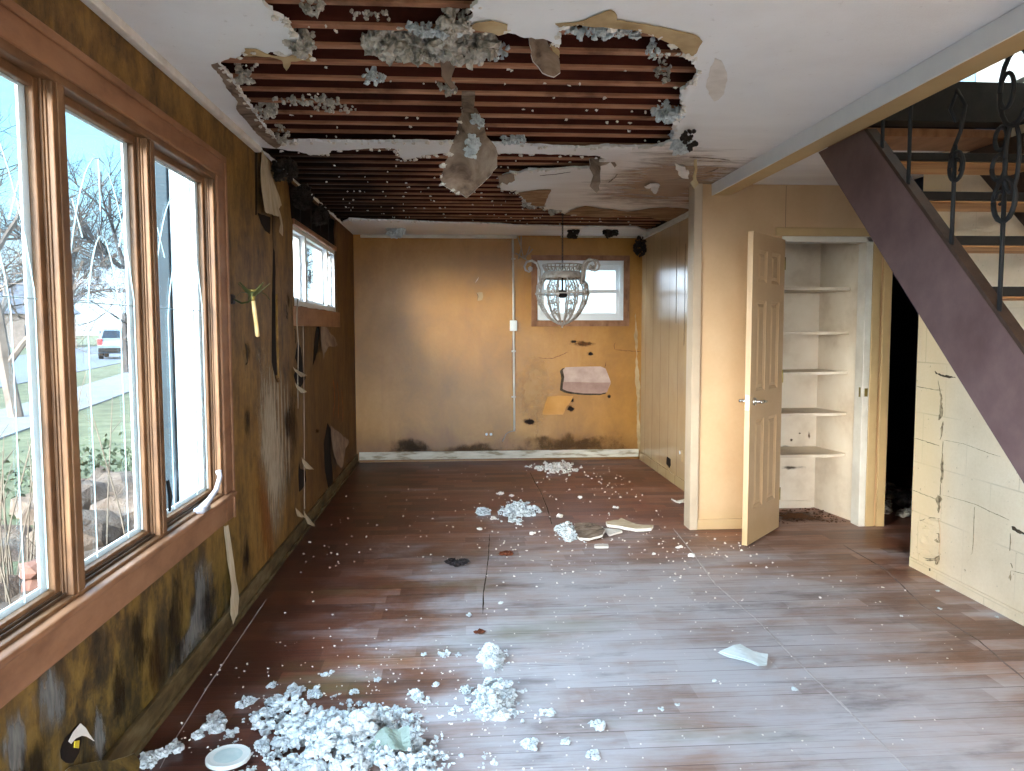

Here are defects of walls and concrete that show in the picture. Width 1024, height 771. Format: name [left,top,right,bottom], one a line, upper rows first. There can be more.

peeling [638,29,727,102]
spalling [218,66,462,195]
peeling [258,151,283,236]
peeling [675,163,689,179]
peeling [331,381,349,468]
mould [397,439,427,452]
water stain [540,435,600,450]
crack [910,382,1006,551]
water stain [132,562,214,688]
water stain [40,668,64,728]
water stain [3,716,46,771]
water stain [94,711,105,760]